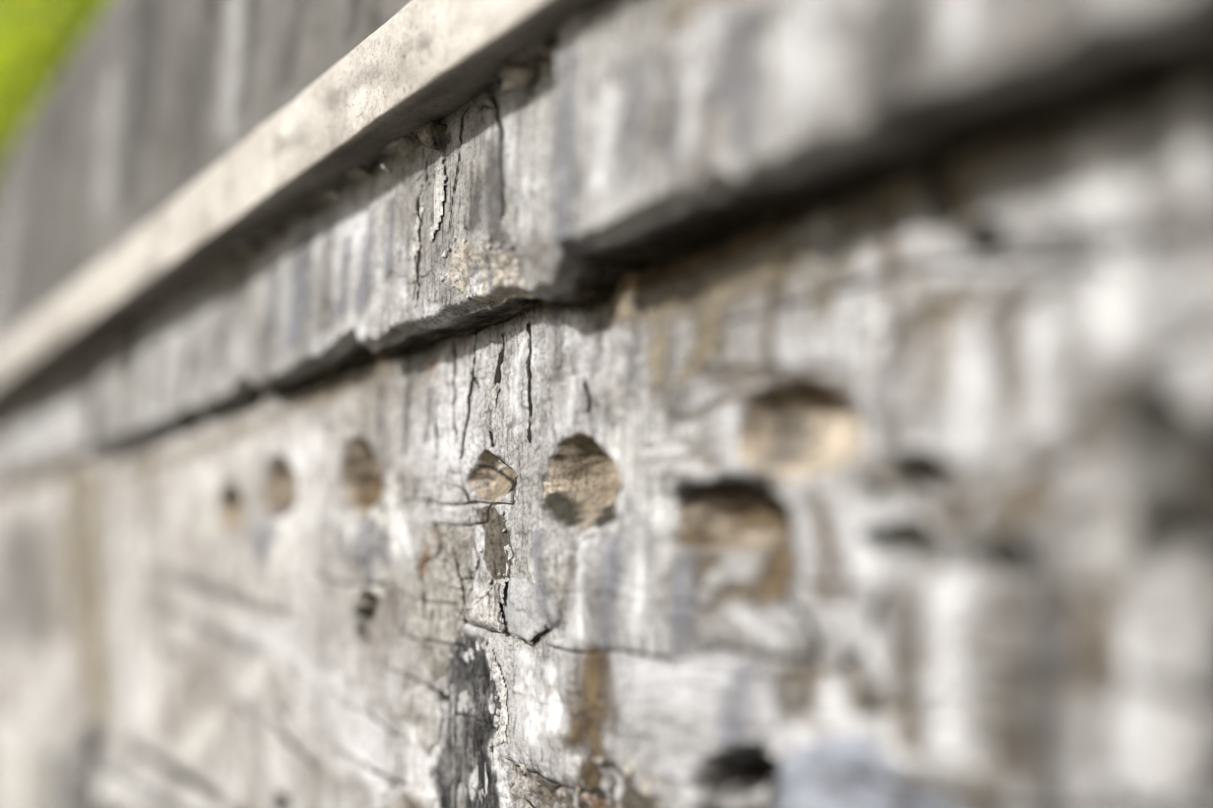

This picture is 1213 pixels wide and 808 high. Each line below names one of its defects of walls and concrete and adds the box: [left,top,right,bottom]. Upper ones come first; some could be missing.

crack [413,96,504,307]
crack [315,323,823,665]
crack [383,667,499,727]
spalling [379,506,664,808]
crack [505,758,624,808]